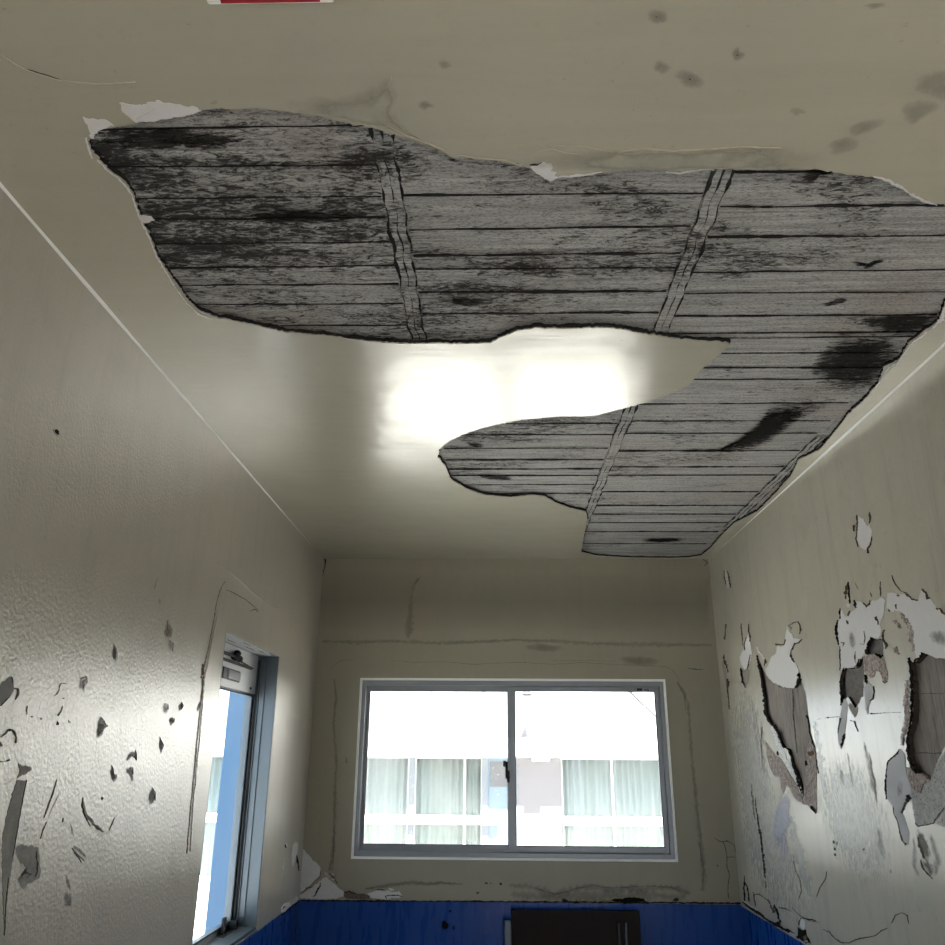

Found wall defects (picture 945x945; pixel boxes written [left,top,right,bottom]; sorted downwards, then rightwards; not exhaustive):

spalling [83,100,945,558]
peeling [0,676,19,706]
peeling [97,717,108,736]
peeling [111,750,137,781]
crack [186,563,283,853]
peeling [281,842,402,916]
spalling [722,621,819,895]
spalling [834,589,945,879]